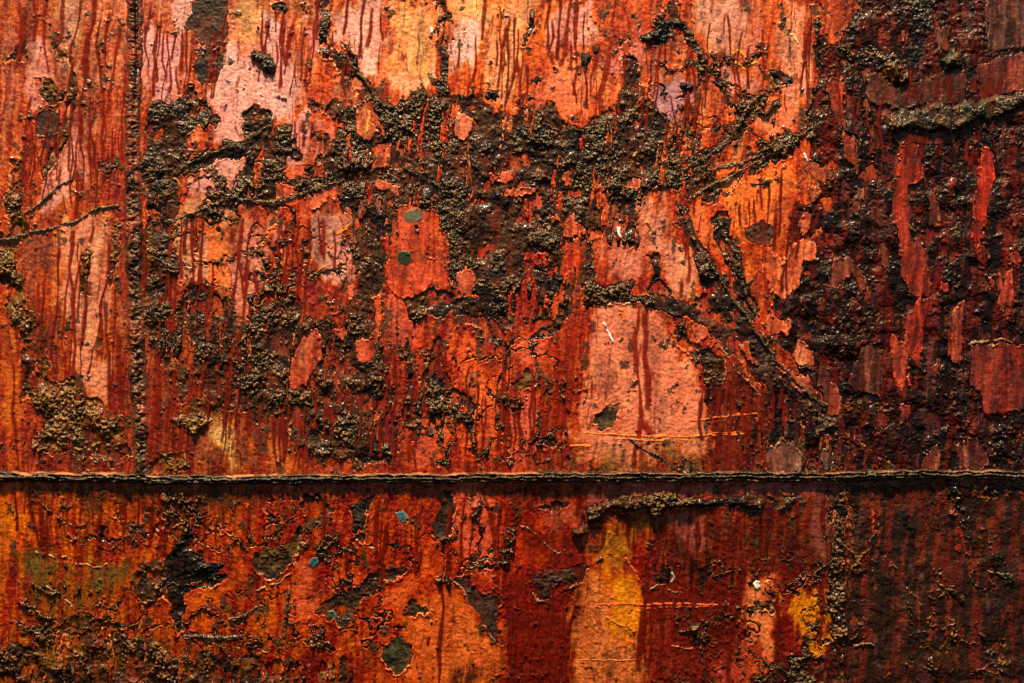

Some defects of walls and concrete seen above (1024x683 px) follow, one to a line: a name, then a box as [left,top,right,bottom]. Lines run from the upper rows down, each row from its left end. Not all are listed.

corrosion [0,0,132,468]
corrosion [138,0,1024,474]
peeling [256,528,319,591]
corrosion [0,479,1024,683]